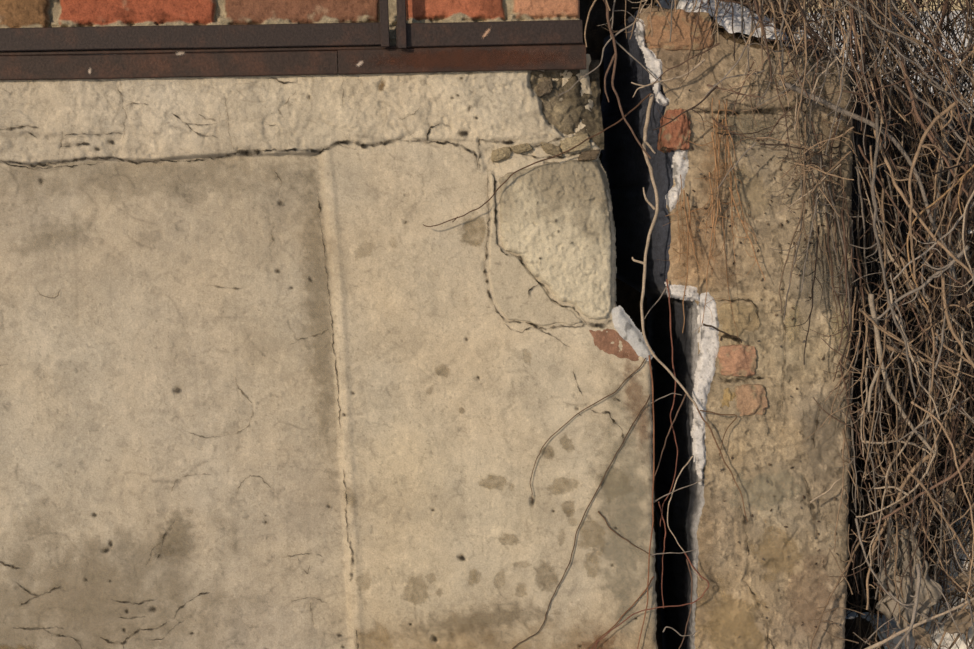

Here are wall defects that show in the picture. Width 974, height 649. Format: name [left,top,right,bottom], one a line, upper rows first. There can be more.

crack [6,90,390,181]
crack [404,111,610,335]
spalling [491,60,604,163]
peeling [634,18,669,106]
peeling [665,149,689,212]
crack [299,201,341,424]
spalling [589,328,640,361]
peeling [665,282,720,486]
crack [343,475,353,576]